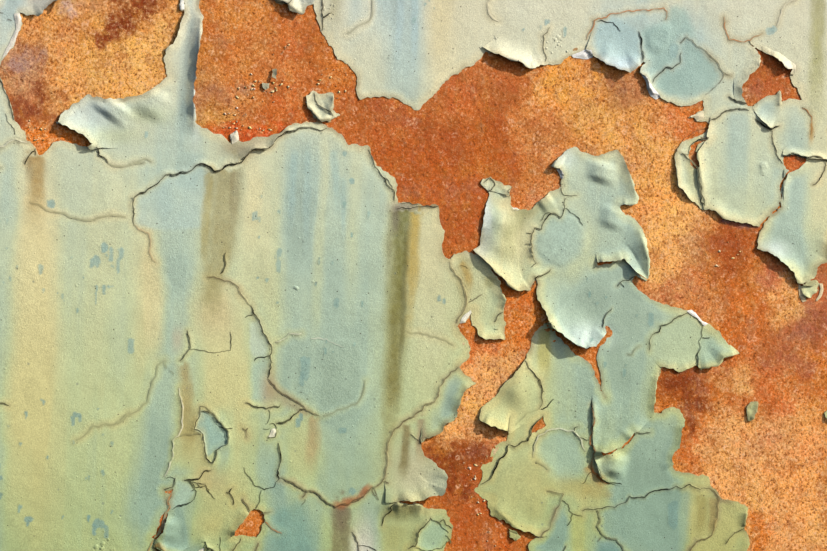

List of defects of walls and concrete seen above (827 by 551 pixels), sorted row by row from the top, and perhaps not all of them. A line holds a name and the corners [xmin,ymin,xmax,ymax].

damp [0,187,83,447]
corrosion [0,0,184,200]
peeling [58,0,207,150]
damp [126,244,167,365]
corrosion [152,512,171,551]
crack [132,93,333,263]
damp [262,496,331,551]
crack [148,252,458,551]
corrosion [193,0,827,551]
peeling [451,147,750,551]
crack [541,398,744,551]
peeling [572,15,827,302]